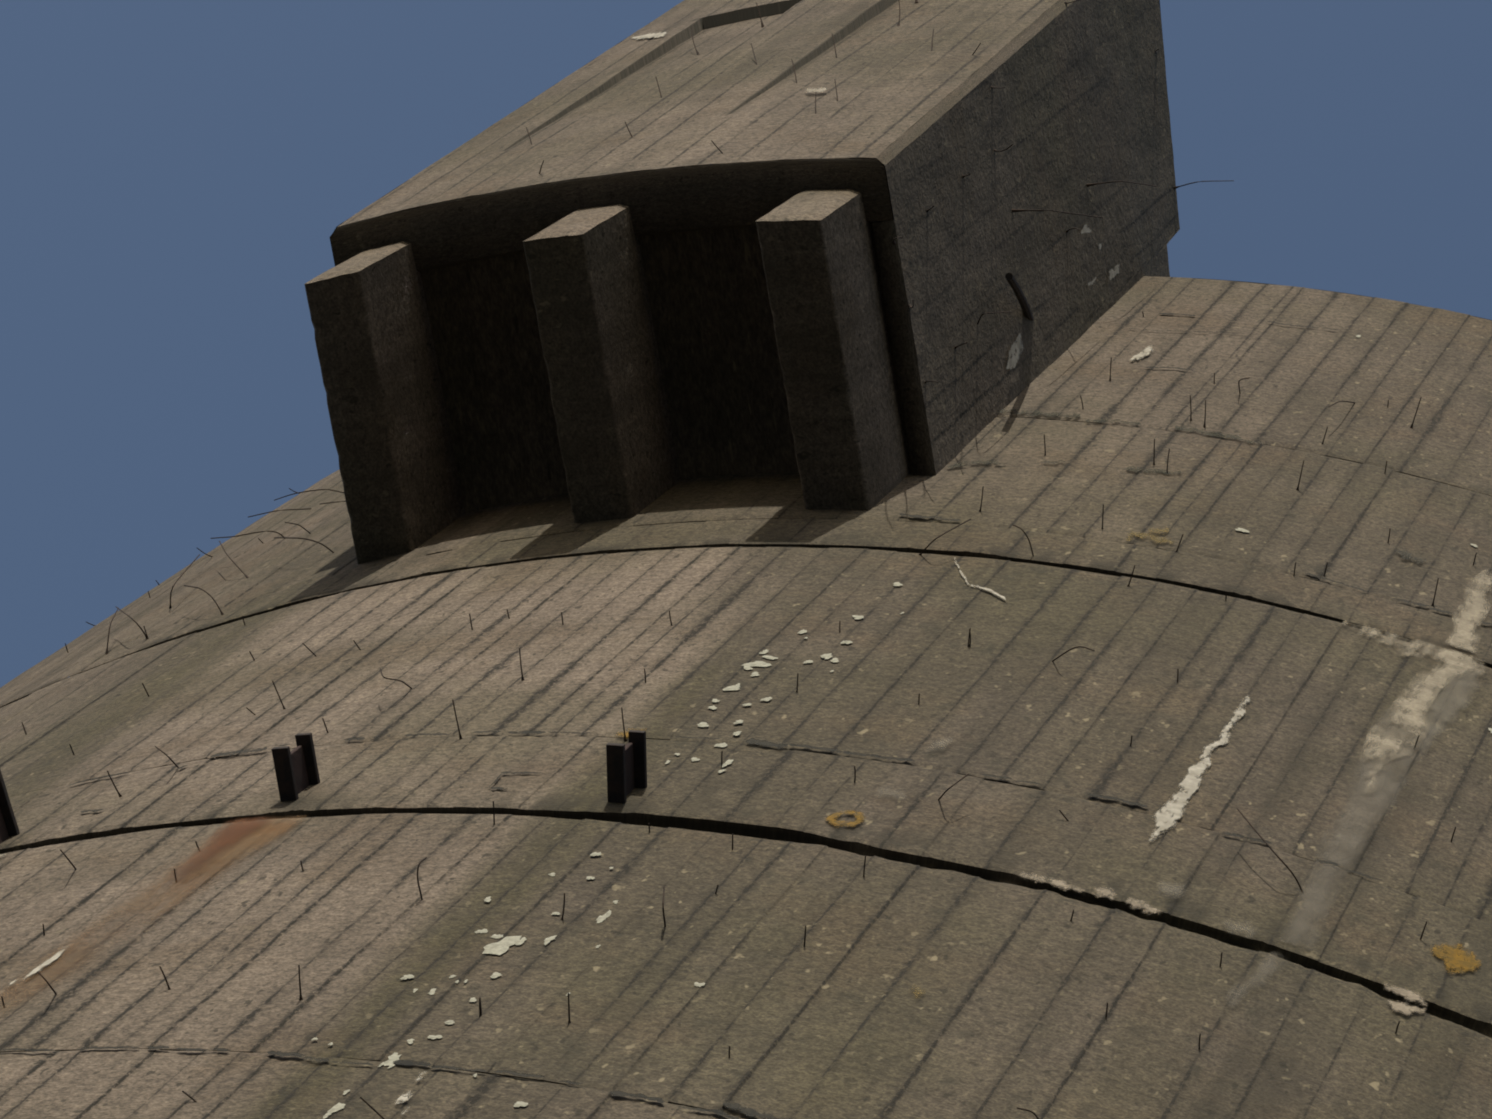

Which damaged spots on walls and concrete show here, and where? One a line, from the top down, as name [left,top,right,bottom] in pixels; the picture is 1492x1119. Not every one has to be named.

crack [178,744,290,769]
crack [344,731,590,740]
water stain [1150,696,1250,840]
water stain [1291,572,1492,940]
crack [70,772,128,813]
corrosion [195,819,294,866]